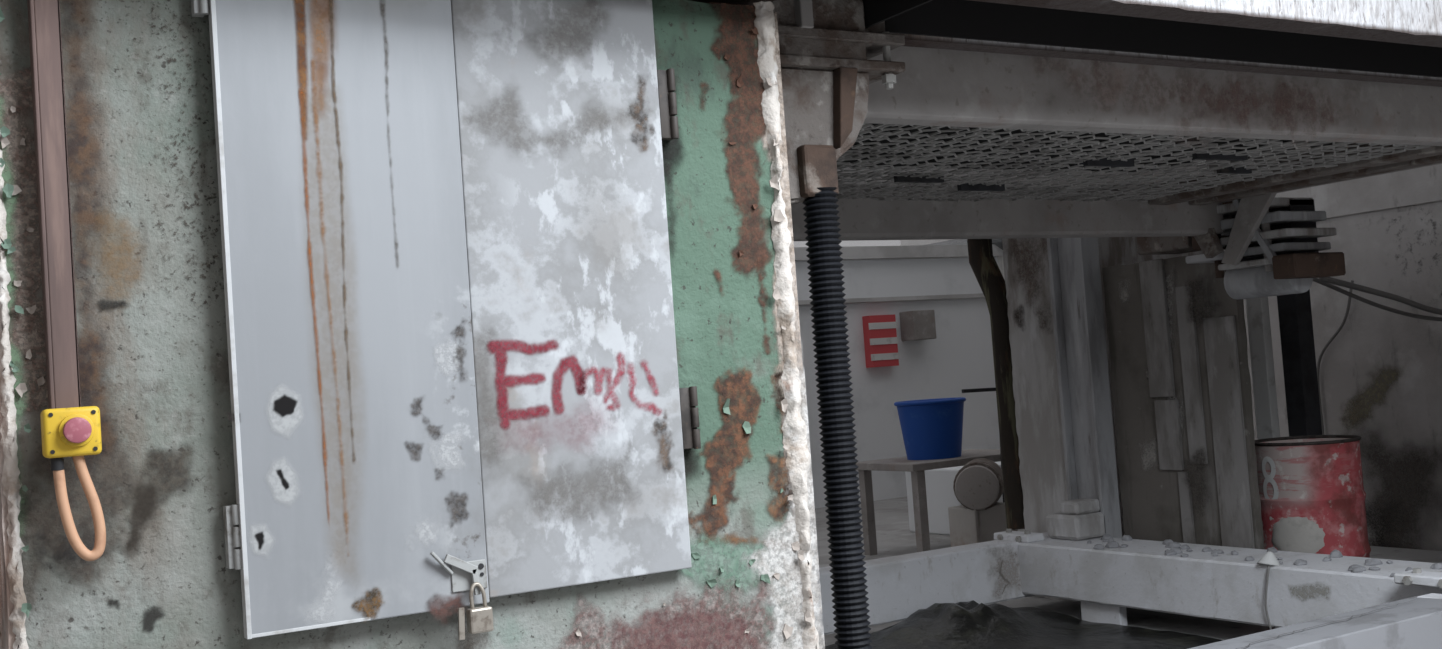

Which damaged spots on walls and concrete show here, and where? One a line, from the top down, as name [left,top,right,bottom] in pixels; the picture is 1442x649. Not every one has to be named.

corrosion [294,0,344,264]
peeling [0,67,48,649]
corrosion [308,228,348,401]
corrosion [323,426,355,524]
spalling [560,1,825,649]